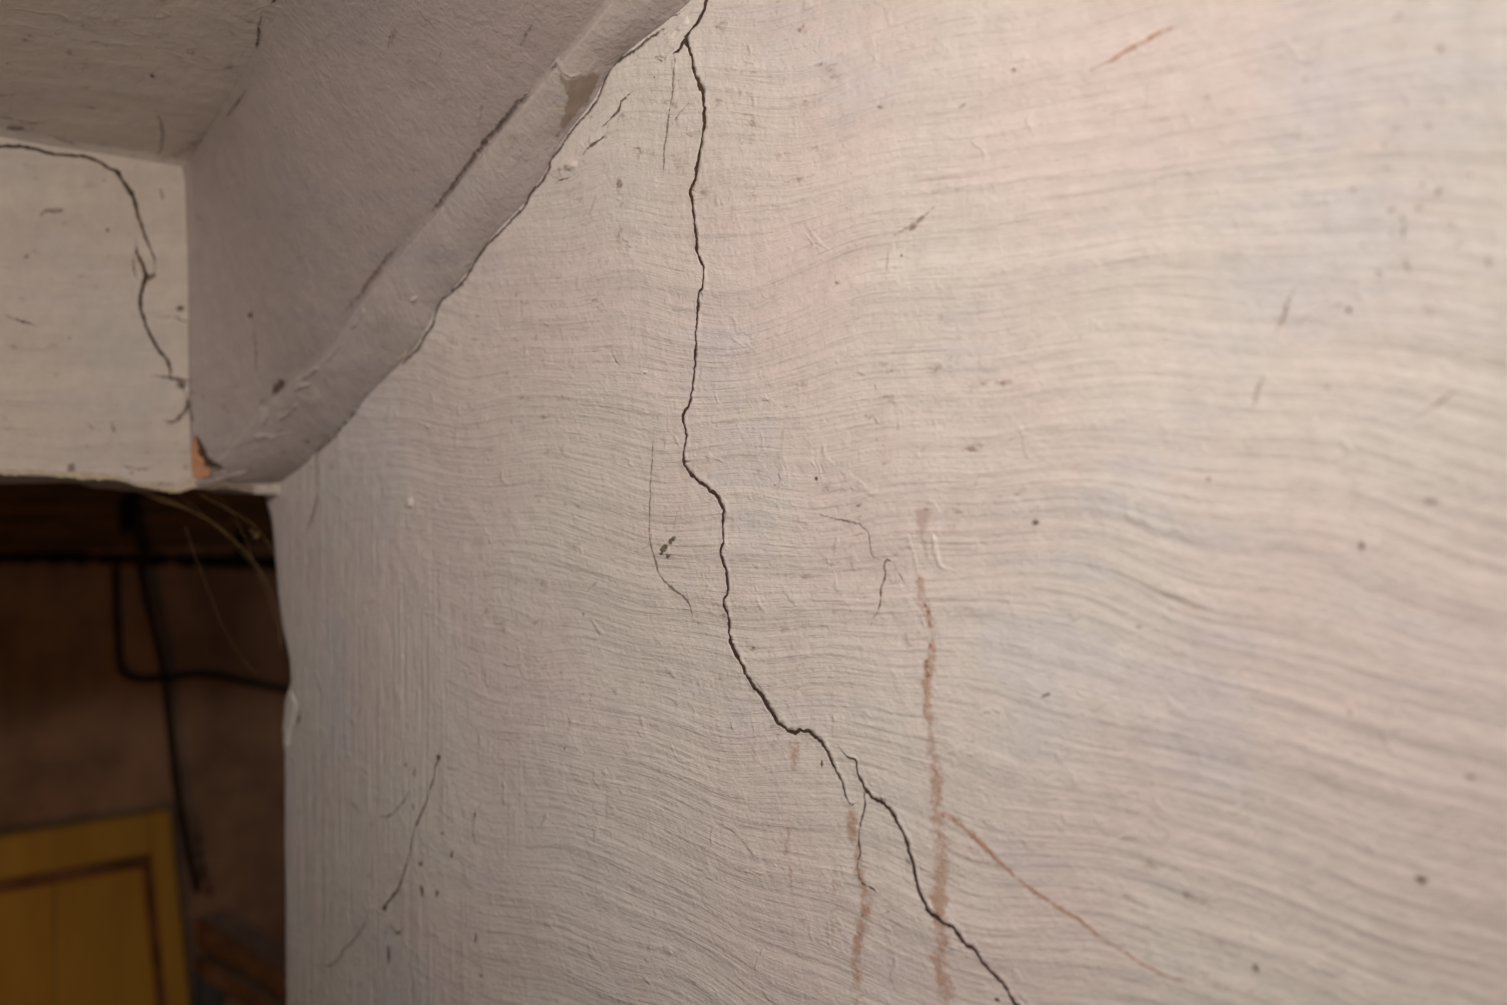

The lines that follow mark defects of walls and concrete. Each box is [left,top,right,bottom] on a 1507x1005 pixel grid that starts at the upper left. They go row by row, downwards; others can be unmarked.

crack [255,0,276,49]
crack [0,144,185,375]
crack [403,0,1024,1005]
corrosion [941,813,1108,943]